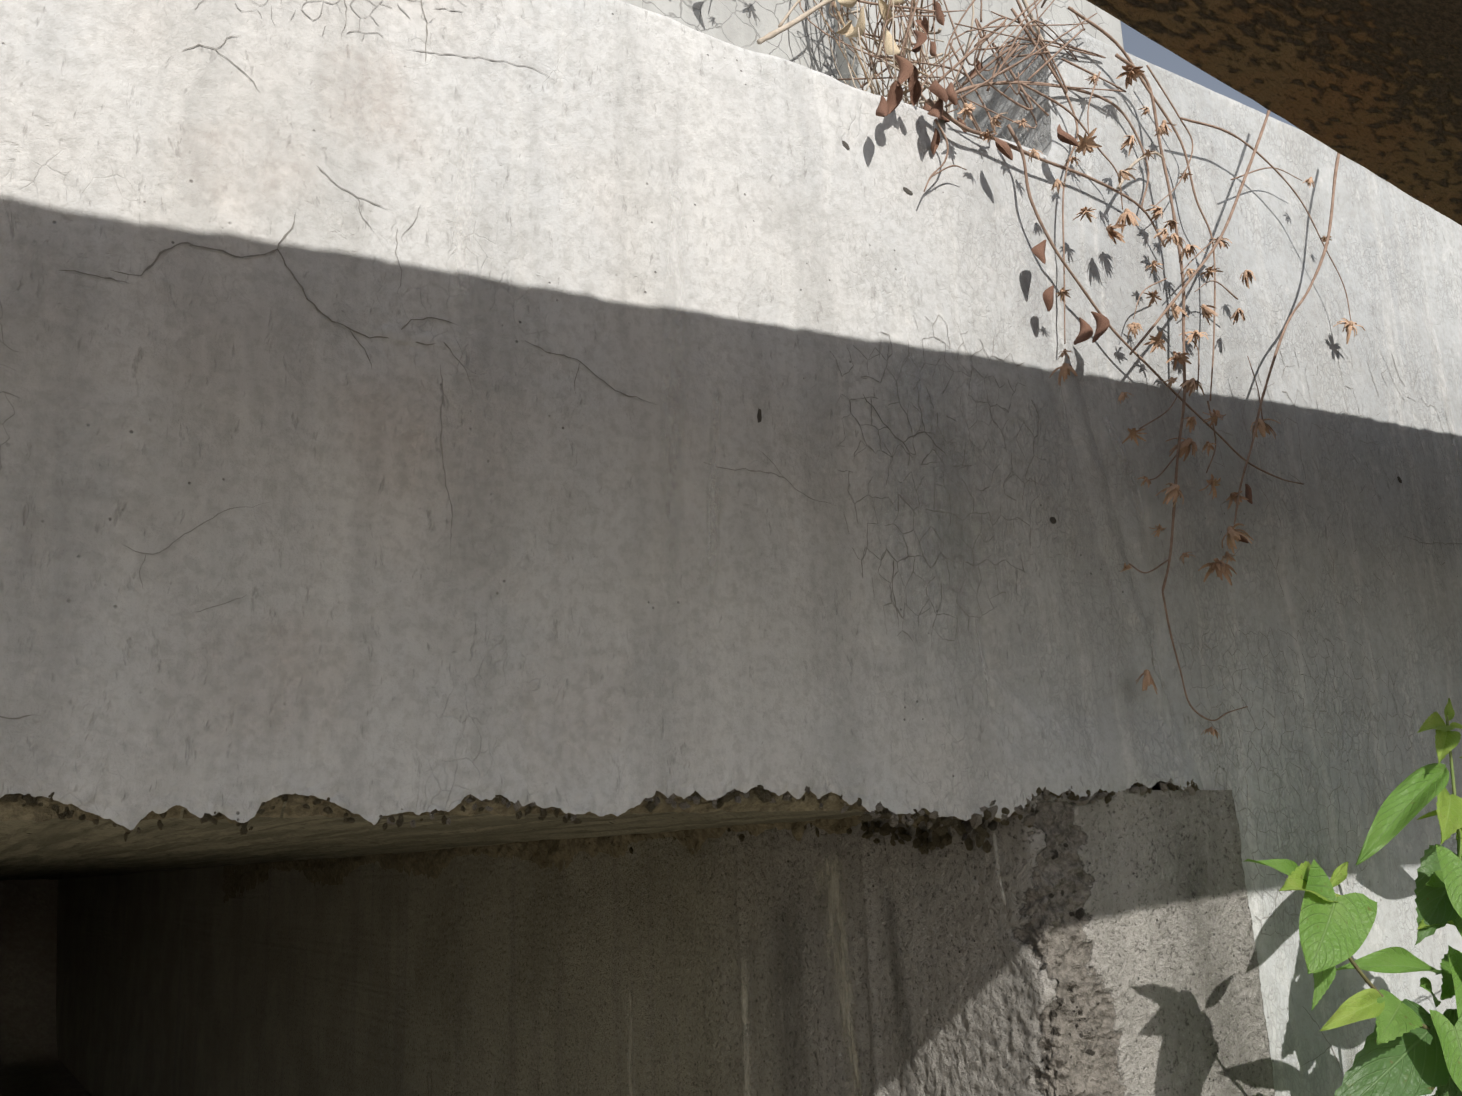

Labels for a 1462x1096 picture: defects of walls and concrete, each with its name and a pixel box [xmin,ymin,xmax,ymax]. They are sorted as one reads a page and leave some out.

crack [184,0,553,92]
crack [60,166,473,556]
crack [525,341,654,404]
crack [703,315,1043,646]
flaking render [0,792,355,842]
flaking render [378,795,586,830]
water stain [822,862,858,1083]
spalling [625,778,1198,1096]